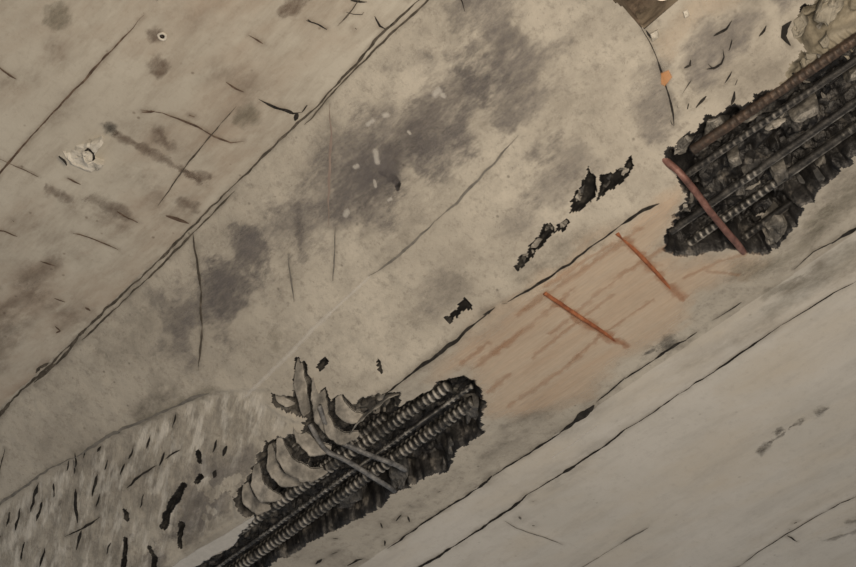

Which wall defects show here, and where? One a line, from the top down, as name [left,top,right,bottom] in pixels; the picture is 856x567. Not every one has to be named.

crack [0,0,429,417]
crack [369,136,518,276]
crack [382,204,658,395]
spalling [513,155,635,271]
corrosion [455,205,728,409]
crack [640,25,674,124]
spalling [661,0,856,257]
crack [796,228,856,268]
crack [0,393,209,567]
crack [212,440,227,478]
spalling [172,358,488,567]
crack [380,283,855,567]